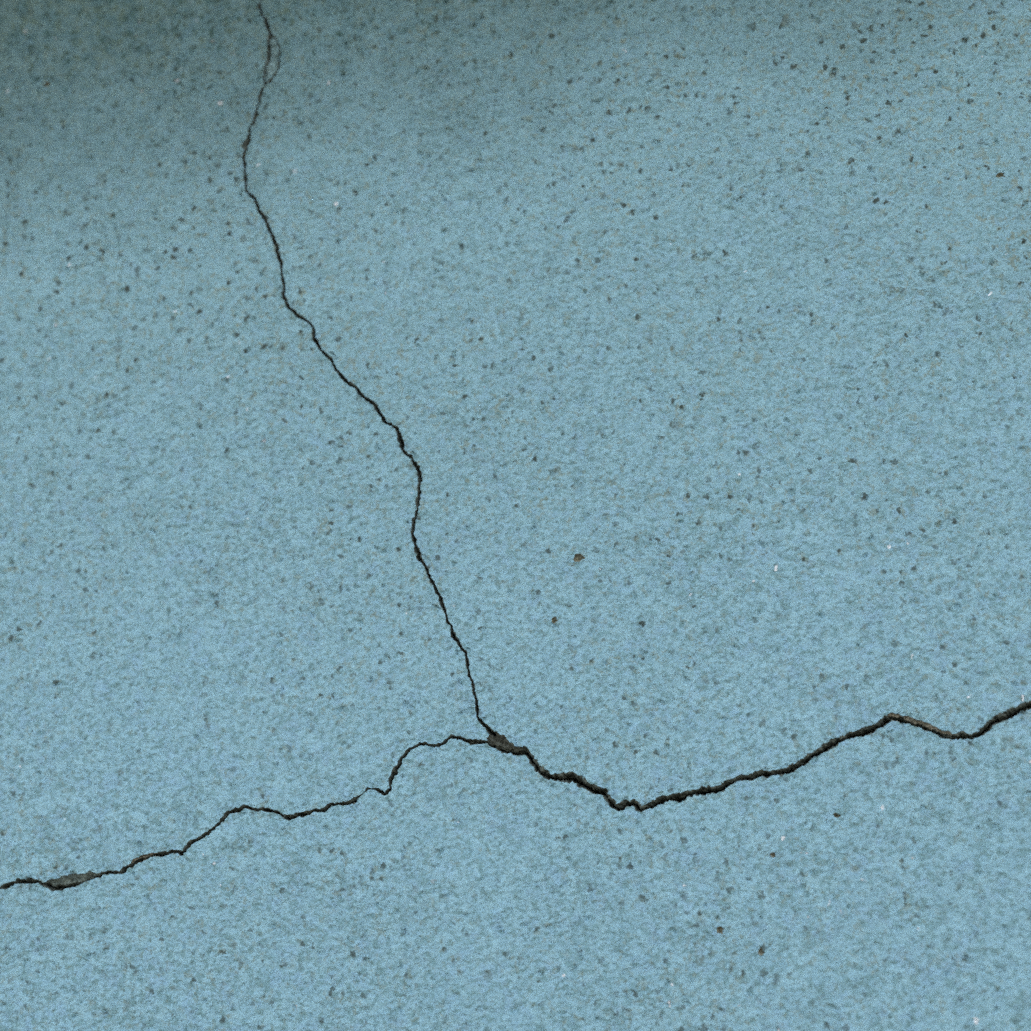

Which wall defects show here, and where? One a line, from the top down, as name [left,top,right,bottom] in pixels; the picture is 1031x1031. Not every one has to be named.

crack [241,0,496,737]
crack [0,700,1031,891]